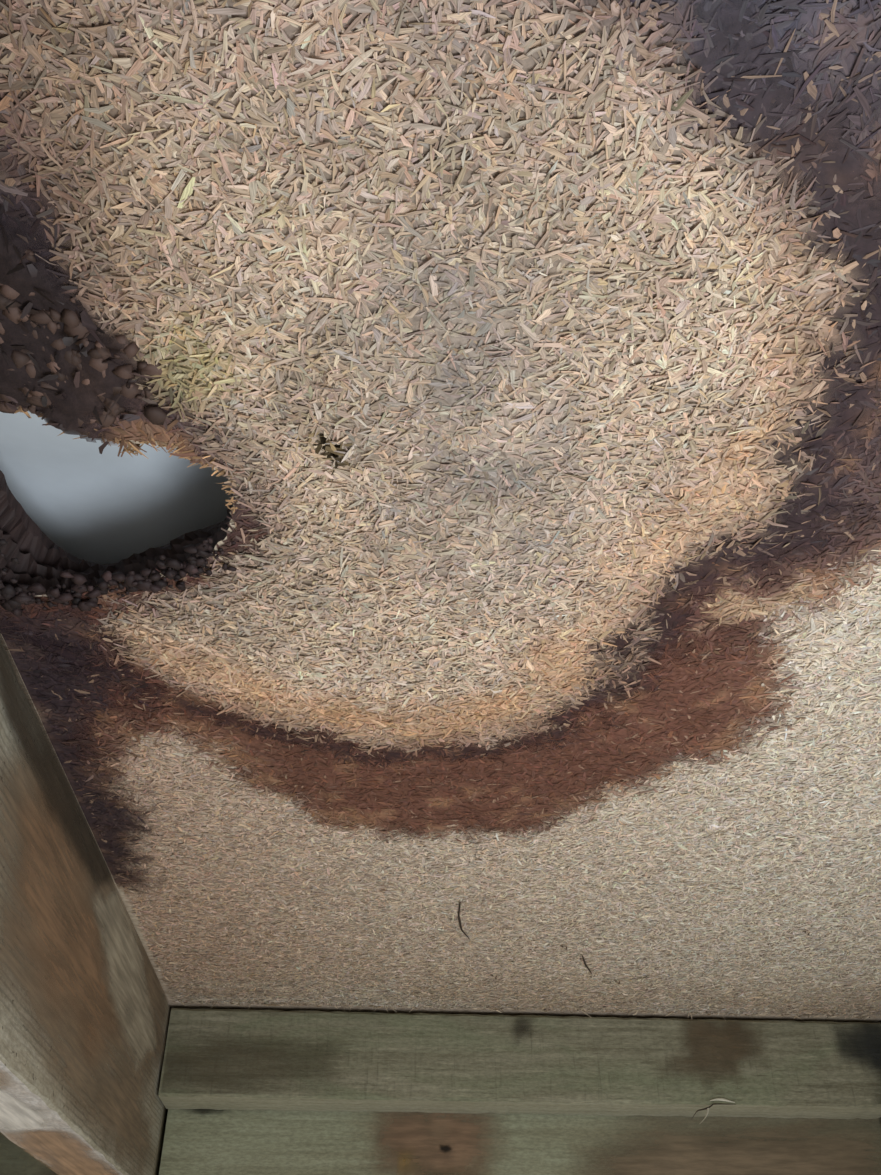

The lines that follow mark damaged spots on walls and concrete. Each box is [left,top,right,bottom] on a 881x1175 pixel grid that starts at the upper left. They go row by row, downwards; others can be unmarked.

spalling [308,431,354,475]
water stain [0,0,881,891]
peeling [107,550,881,1019]
water stain [684,1020,753,1073]